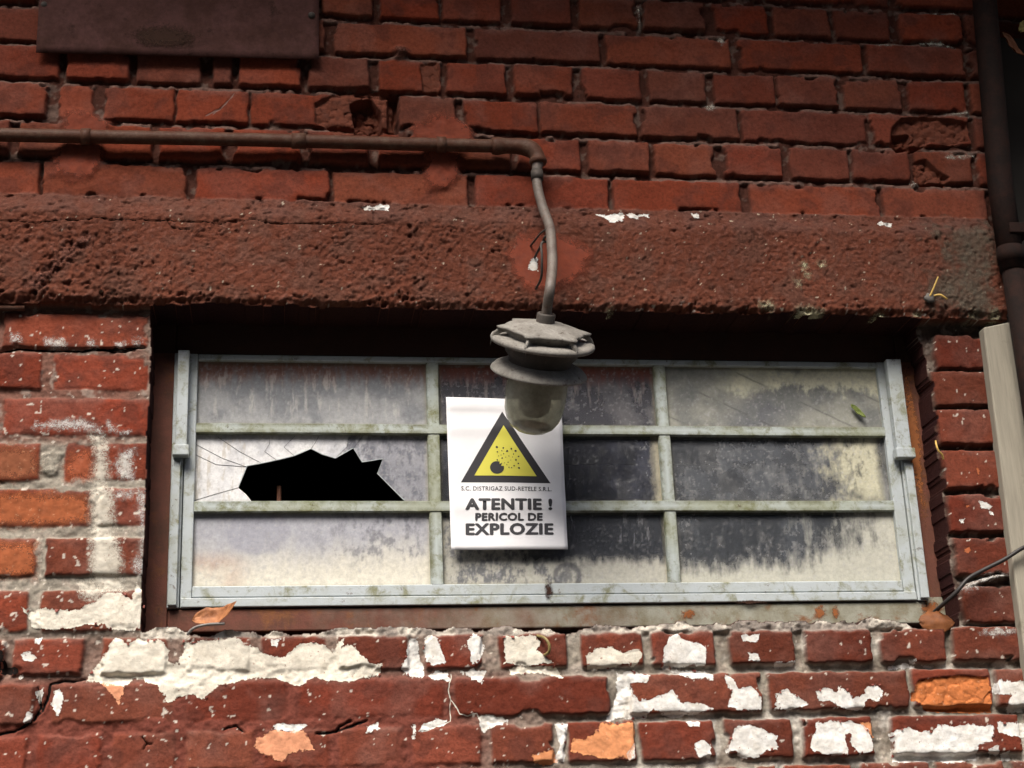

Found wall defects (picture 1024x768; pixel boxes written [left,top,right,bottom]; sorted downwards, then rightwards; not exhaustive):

spalling [314,87,400,136]
leakage [41,421,144,600]
peeling [21,582,383,705]
peeling [401,633,486,684]
peeling [503,635,564,679]
crack [0,679,86,736]
peeling [254,723,315,762]
crack [316,721,366,735]
peeling [411,718,447,739]
peeling [478,714,508,733]
peeling [532,634,883,766]
peeling [887,659,1024,763]